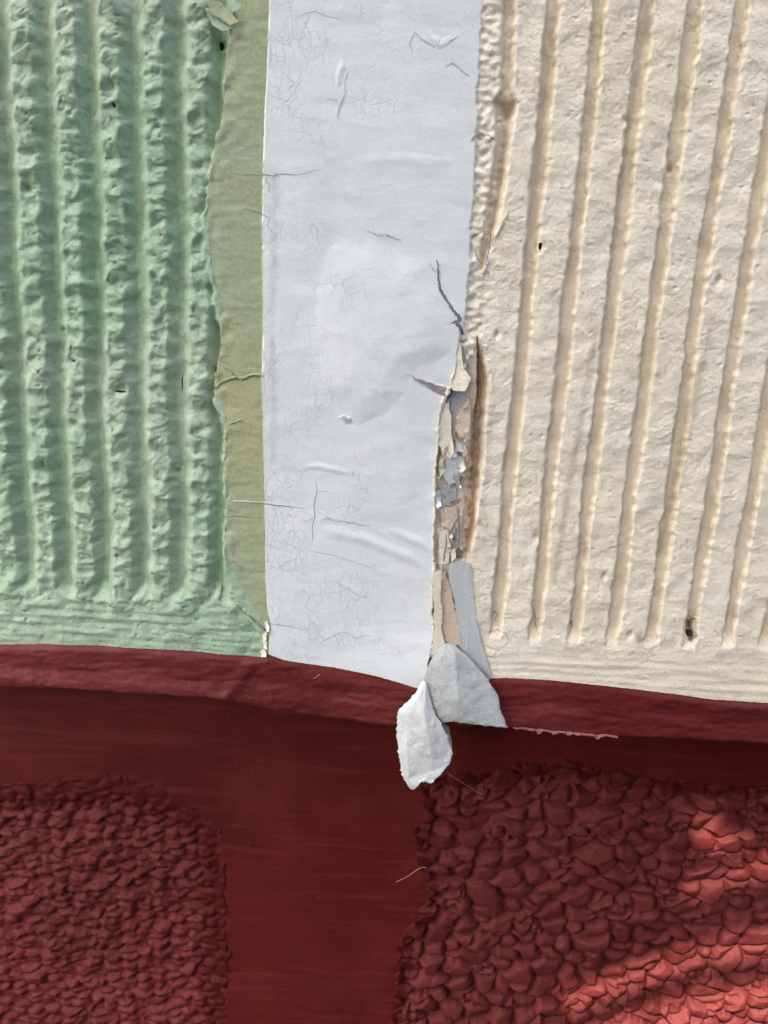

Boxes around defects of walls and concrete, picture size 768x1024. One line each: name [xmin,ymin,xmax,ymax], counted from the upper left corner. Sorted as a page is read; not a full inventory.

crack [409,32,470,77]
crack [333,69,349,118]
crack [231,168,325,229]
crack [366,231,402,240]
crack [430,259,465,335]
crack [411,375,453,398]
crack [225,484,372,598]
peeling [396,332,618,790]
crack [234,601,365,648]